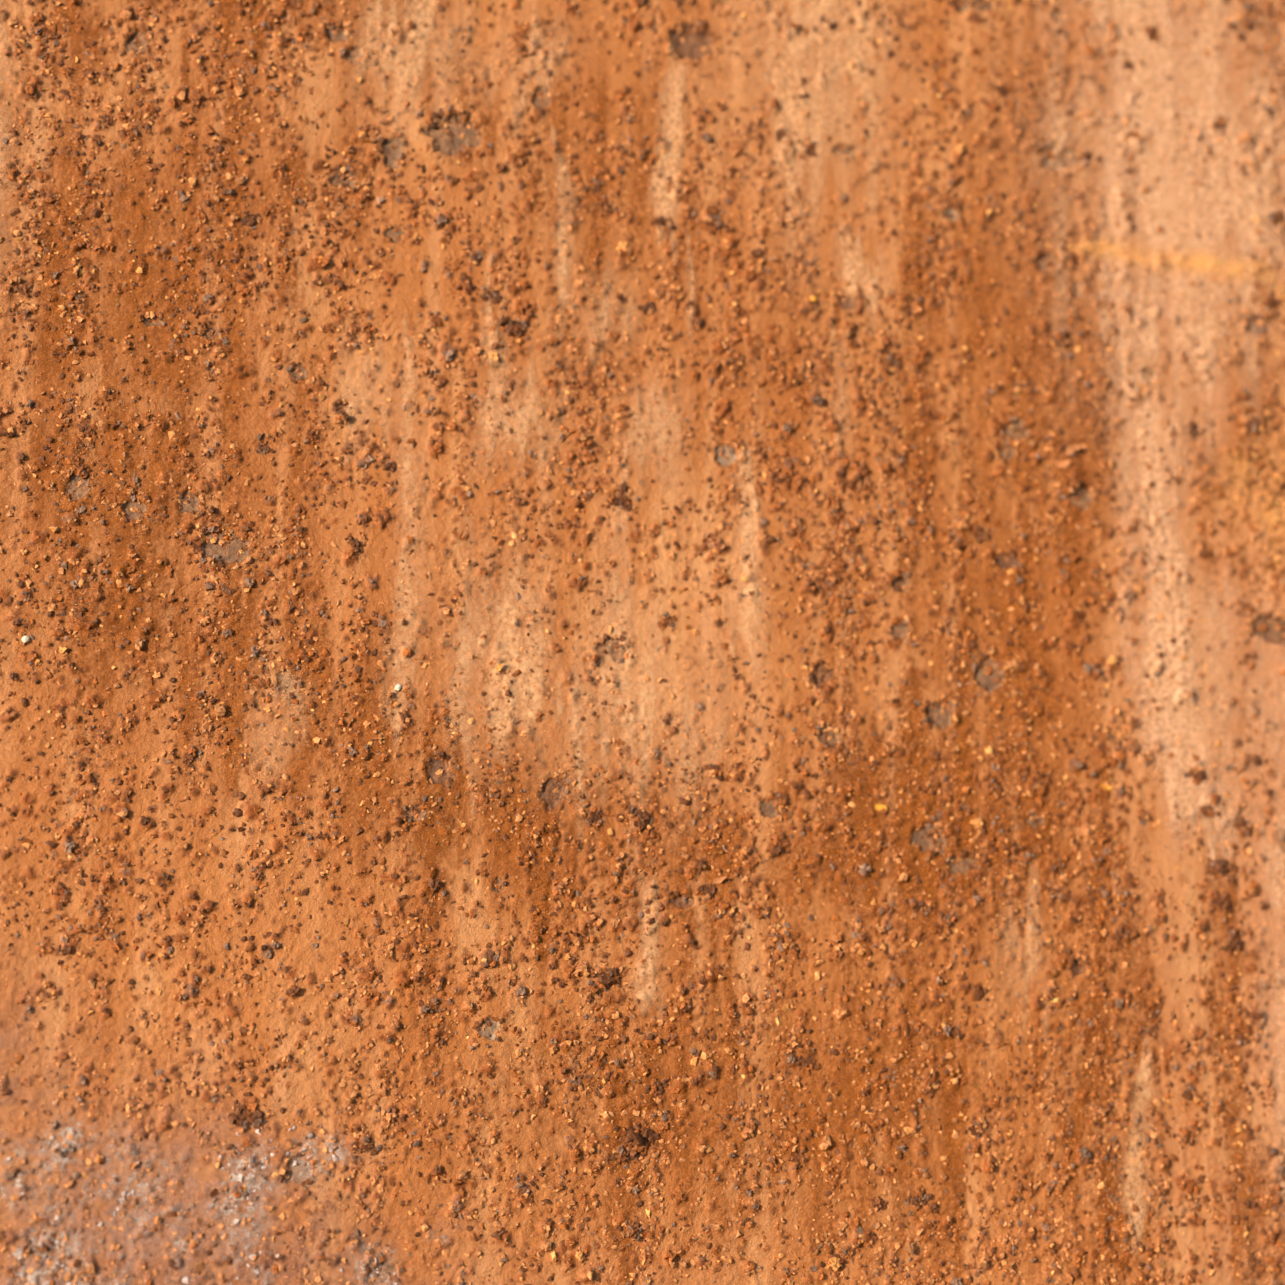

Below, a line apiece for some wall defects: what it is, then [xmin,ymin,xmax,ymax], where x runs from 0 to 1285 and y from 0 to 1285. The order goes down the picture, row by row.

water stain [0,1099,342,1285]
water stain [340,1242,398,1285]